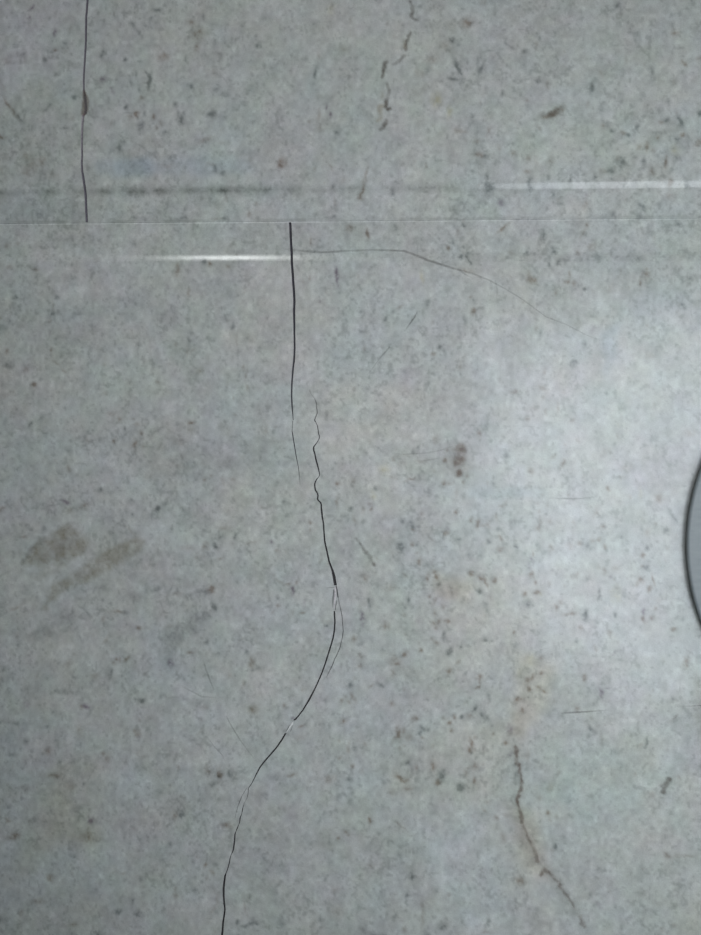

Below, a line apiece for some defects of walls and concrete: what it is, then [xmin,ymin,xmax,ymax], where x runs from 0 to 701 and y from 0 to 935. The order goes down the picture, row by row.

crack [81,0,89,222]
crack [221,222,343,935]